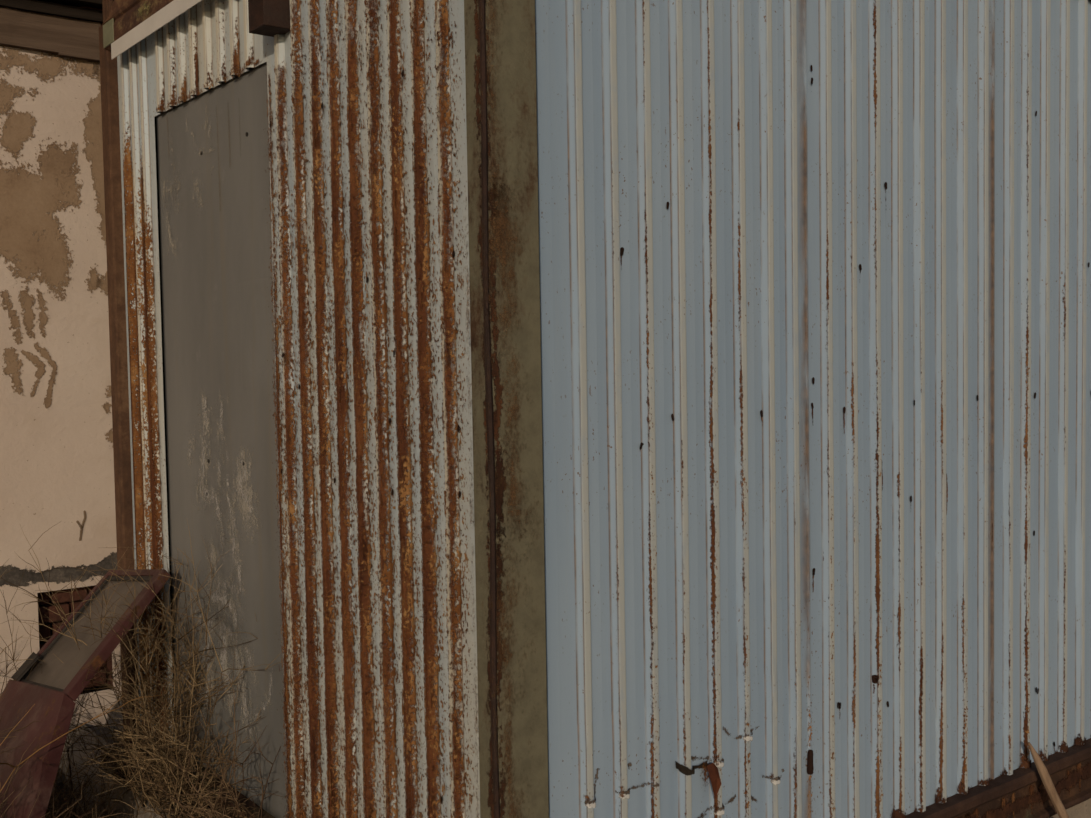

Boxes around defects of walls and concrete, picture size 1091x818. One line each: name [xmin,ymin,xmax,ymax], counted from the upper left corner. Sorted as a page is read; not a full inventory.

flaking render [0,46,108,396]
corrosion [123,122,163,569]
corrosion [156,12,259,112]
corrosion [263,0,531,818]
corrosion [640,210,653,450]
corrosion [648,472,659,818]
corrosion [699,100,721,784]
corrosion [739,355,748,540]
corrosion [741,709,751,813]
corrosion [828,632,856,818]
corrosion [843,363,855,465]
corrosion [872,299,1091,818]